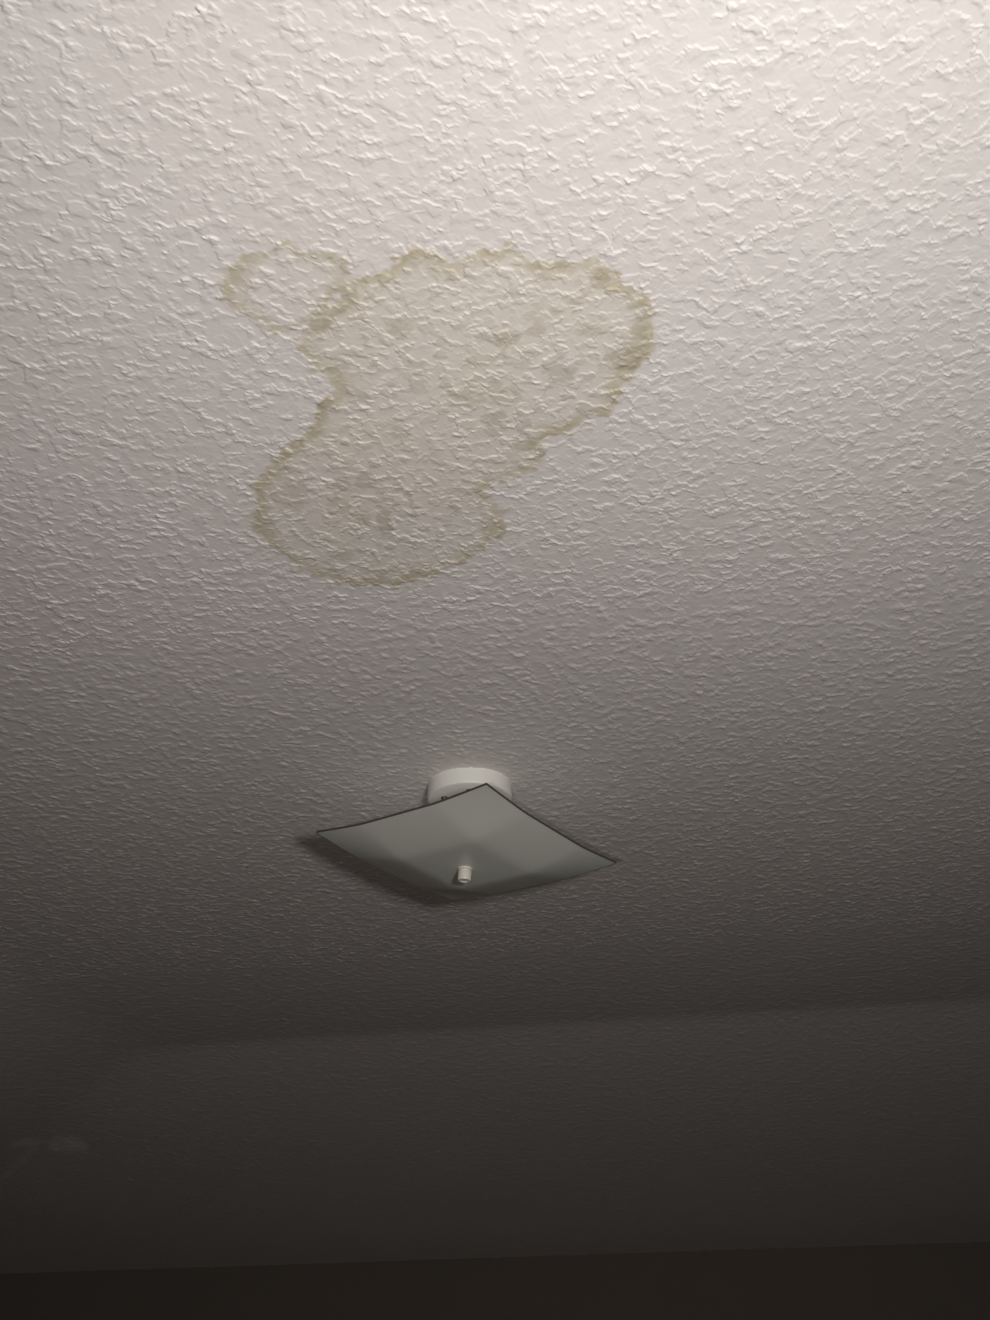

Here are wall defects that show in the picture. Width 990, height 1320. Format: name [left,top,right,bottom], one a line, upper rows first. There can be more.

water stain [217,236,663,589]